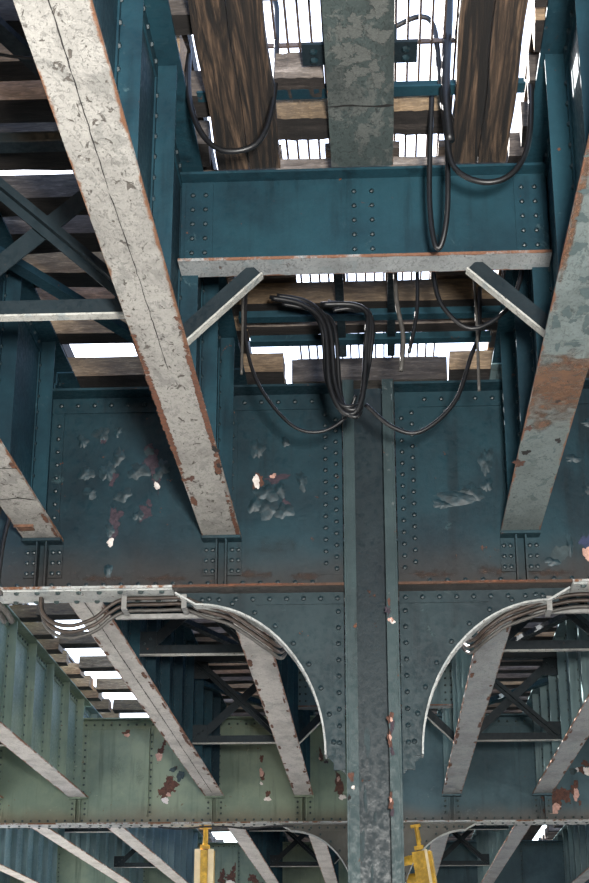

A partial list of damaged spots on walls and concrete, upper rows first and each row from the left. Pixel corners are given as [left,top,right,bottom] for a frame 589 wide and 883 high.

rust [529,355,589,429]
peeling [105,443,170,547]
peeling [247,471,307,521]
peeling [544,534,589,566]
peeling [157,775,180,804]
peeling [259,755,272,801]
peeling [334,772,377,821]
peeling [541,760,589,814]
peeling [218,863,236,883]